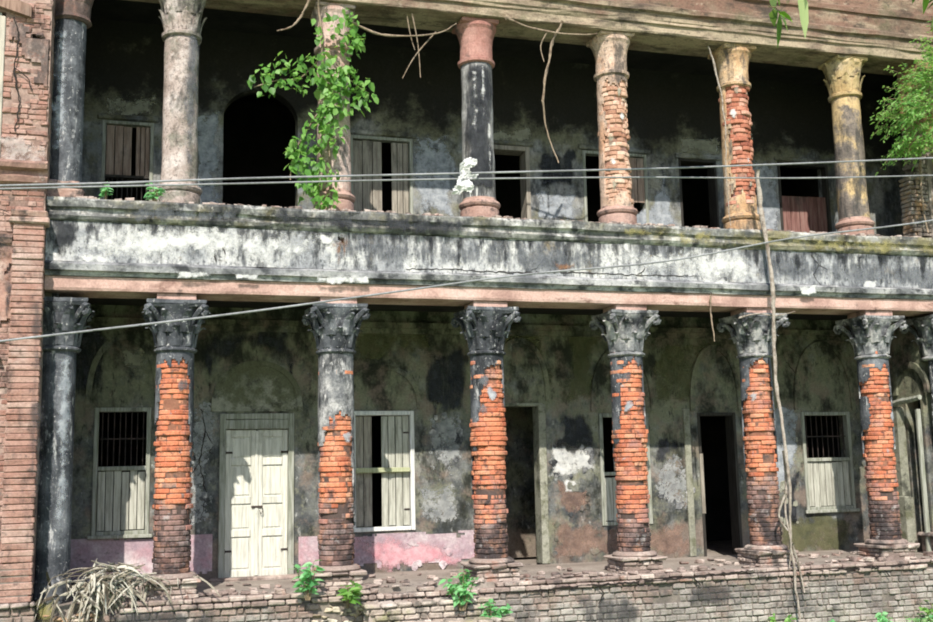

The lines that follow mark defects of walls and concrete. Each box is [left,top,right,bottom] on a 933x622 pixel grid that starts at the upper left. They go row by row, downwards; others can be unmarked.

water stain [53,220,98,251]
water stain [276,211,594,270]
water stain [467,65,493,187]
water stain [538,149,576,189]
spalling [538,78,733,229]
spalling [681,85,880,236]
water stain [76,329,106,393]
spalling [152,357,215,530]
spalling [420,360,508,524]
water stain [557,415,593,454]
spalling [548,352,696,558]
spalling [742,357,800,493]